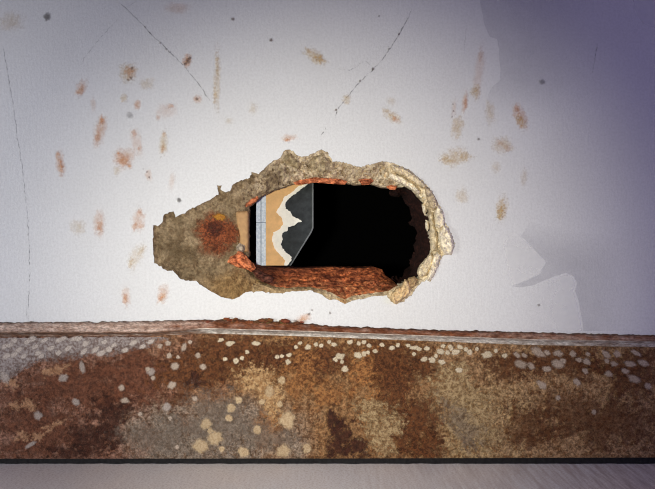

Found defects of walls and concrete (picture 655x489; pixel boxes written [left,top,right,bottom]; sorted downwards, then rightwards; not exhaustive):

rust [194,211,240,255]
spalling [153,150,455,304]
rust [0,334,451,458]
leakage [426,349,506,453]
rust [482,346,655,405]